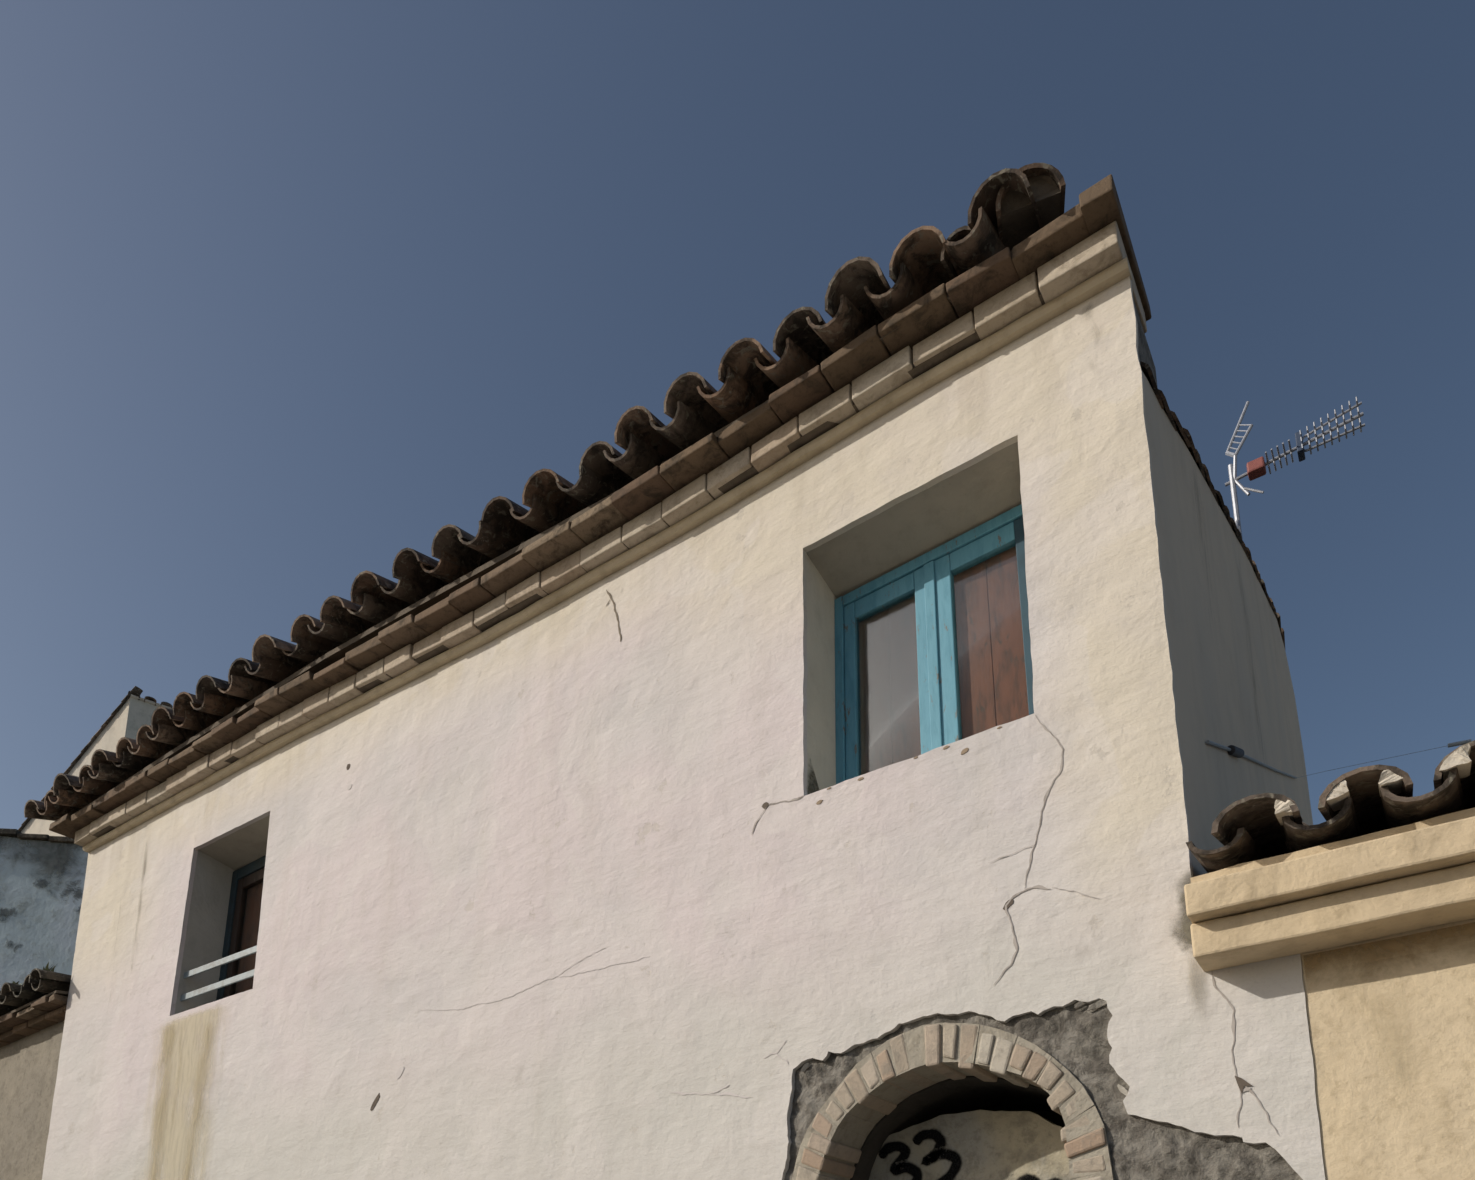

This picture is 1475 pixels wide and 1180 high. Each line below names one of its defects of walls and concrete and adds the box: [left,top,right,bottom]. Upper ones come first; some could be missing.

crack [606,590,622,642]
leakage [1,836,83,878]
crack [988,715,1100,985]
leakage [151,1010,217,1180]
crack [426,947,649,1011]
spalling [785,999,1303,1180]
crack [1212,972,1278,1134]